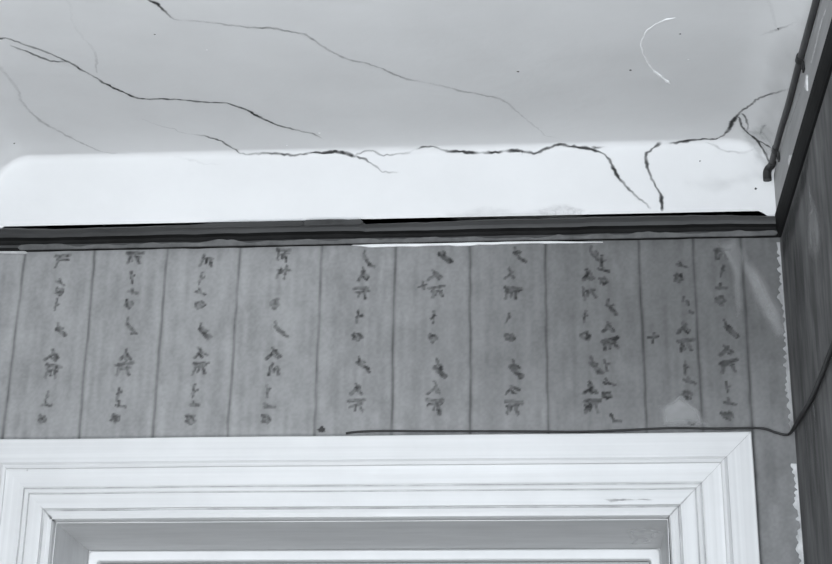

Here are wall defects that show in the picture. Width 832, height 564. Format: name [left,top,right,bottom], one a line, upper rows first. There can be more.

crack [0,38,294,130]
crack [269,150,367,160]
crack [420,143,630,191]
crack [645,94,770,209]